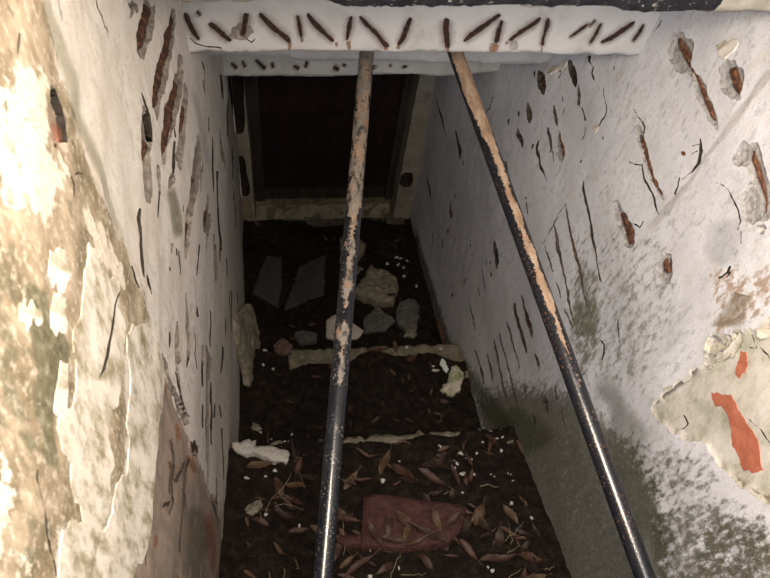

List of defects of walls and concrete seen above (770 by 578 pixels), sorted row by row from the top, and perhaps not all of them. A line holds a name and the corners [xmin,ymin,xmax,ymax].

spalling [128,0,155,60]
rust [184,10,201,40]
rust [208,13,249,42]
rust [259,13,412,50]
rust [463,13,550,52]
spalling [48,85,68,154]
spalling [141,8,188,218]
spalling [668,31,718,130]
spalling [716,39,744,101]
spalling [629,109,665,215]
spalling [732,140,770,235]
peeling [18,242,222,578]